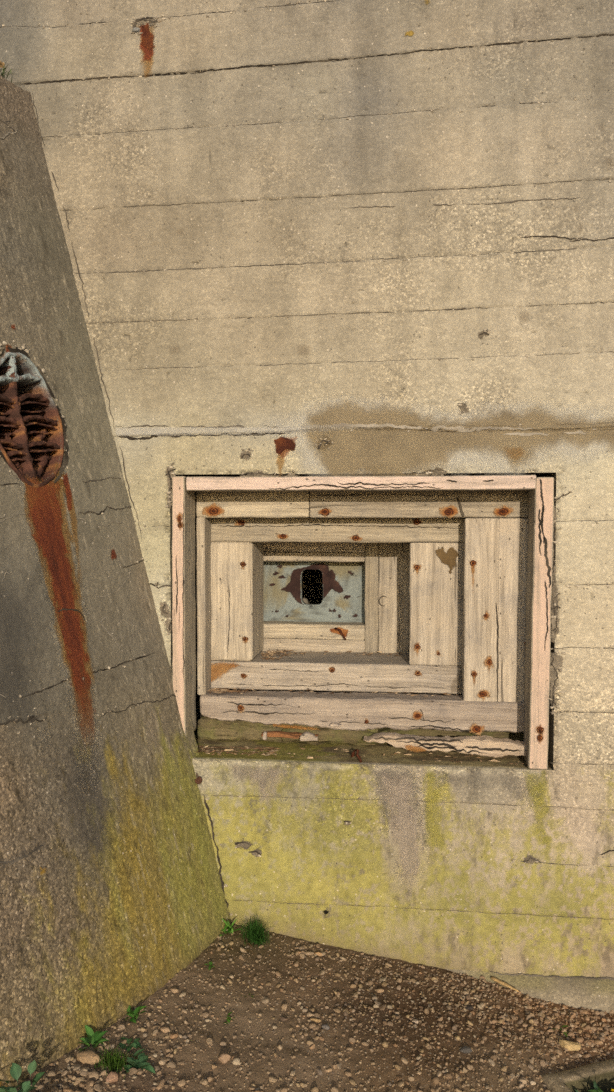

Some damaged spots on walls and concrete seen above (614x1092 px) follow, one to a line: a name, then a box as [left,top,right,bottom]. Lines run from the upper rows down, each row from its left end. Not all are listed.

rust [140,24,155,77]
crack [0,34,614,146]
rust [274,437,296,475]
crack [0,172,614,716]
damp [306,403,614,476]
rust [0,429,94,720]
crack [204,794,360,923]
damp [381,772,444,897]
crack [424,799,519,807]
damp [526,771,549,843]
crack [521,847,614,867]